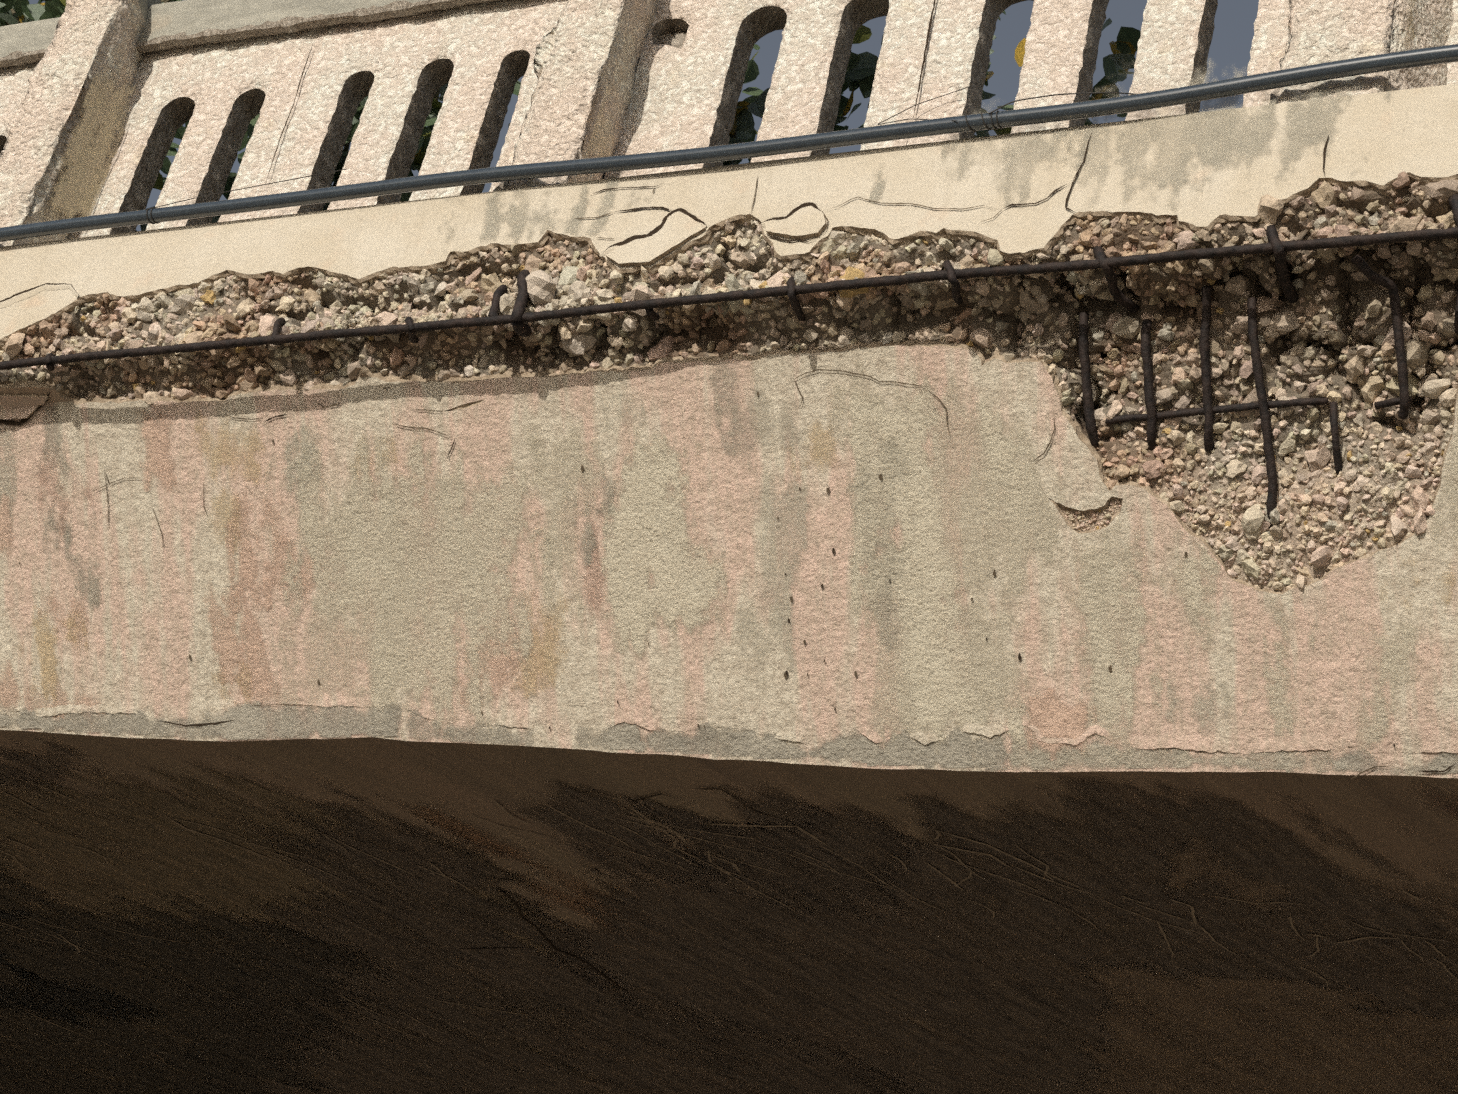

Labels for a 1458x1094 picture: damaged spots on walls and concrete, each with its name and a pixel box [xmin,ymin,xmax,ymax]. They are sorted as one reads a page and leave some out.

crack [0,391,52,426]
crack [0,283,80,309]
peeling [51,75,134,219]
crack [576,184,707,257]
spalling [0,171,1458,594]
crack [751,133,1092,242]
leakage [284,428,553,727]
leakage [566,433,726,657]
leakage [833,379,1025,745]
leakage [1075,536,1162,739]